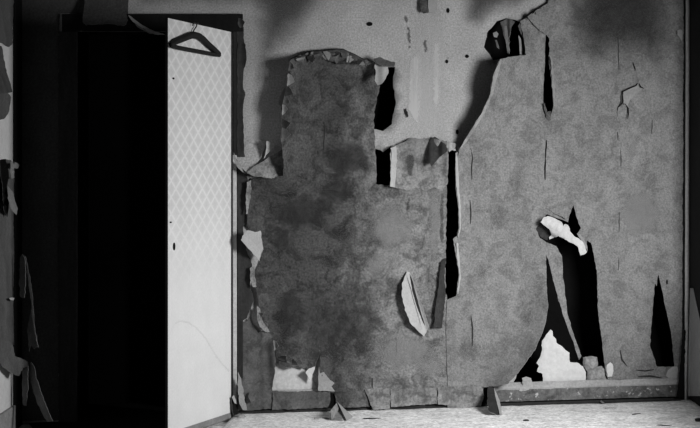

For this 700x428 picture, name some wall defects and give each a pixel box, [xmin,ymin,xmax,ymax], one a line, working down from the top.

spalling [484,18,526,60]
spalling [373,57,396,131]
spalling [543,35,553,117]
peeling [236,138,284,178]
spalling [375,146,391,185]
peeling [241,230,263,261]
spalling [445,150,459,300]
peeling [0,339,28,376]
flaking render [272,357,334,391]
peeling [401,272,429,336]
spalling [514,205,605,391]
spalling [650,275,679,379]